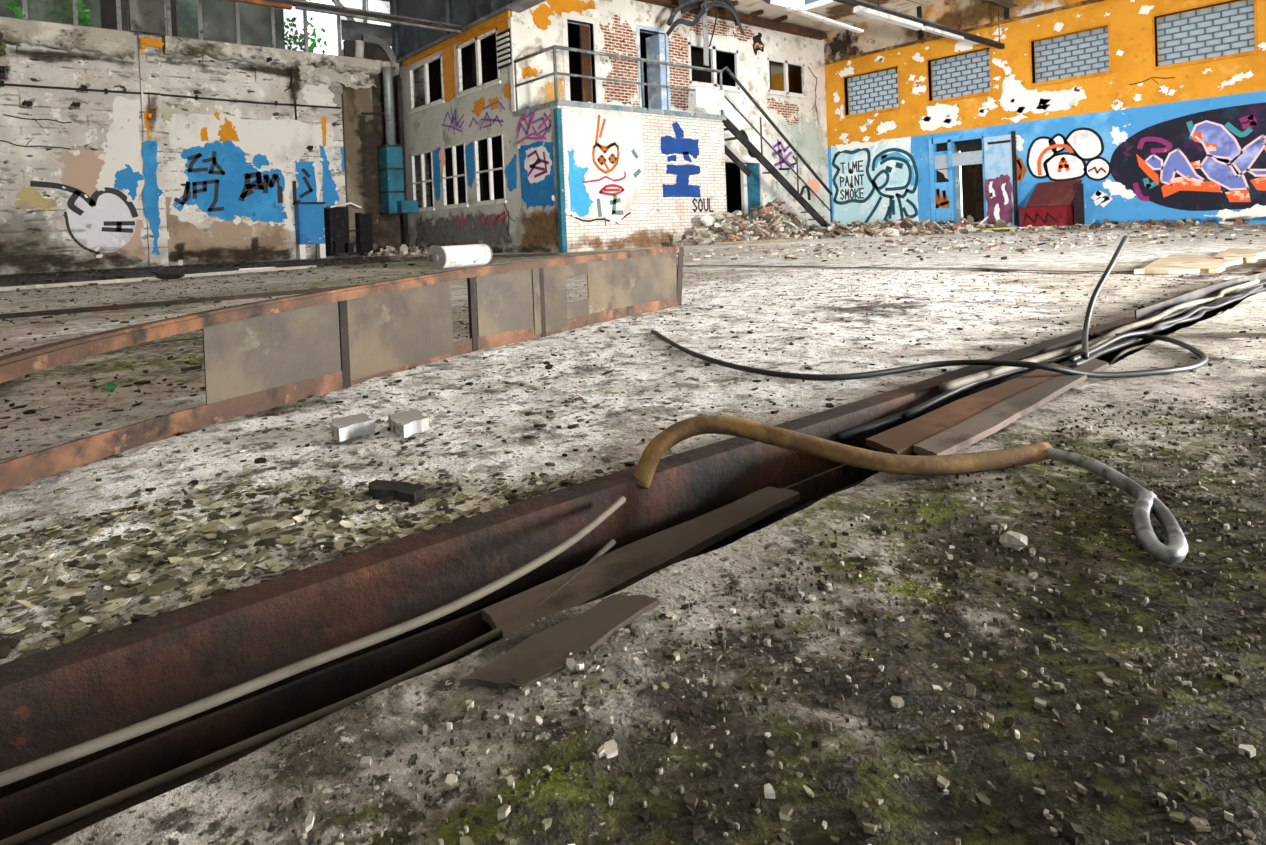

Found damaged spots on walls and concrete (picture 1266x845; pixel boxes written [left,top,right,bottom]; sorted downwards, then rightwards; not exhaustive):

peeling [1130,0,1154,14]
spalling [668,12,764,111]
spalling [504,0,646,224]
spalling [765,97,801,126]
peeling [833,61,897,152]
peeling [875,27,1087,151]
peeling [1111,82,1184,111]
peeling [1217,69,1254,90]
peeling [1110,126,1128,145]